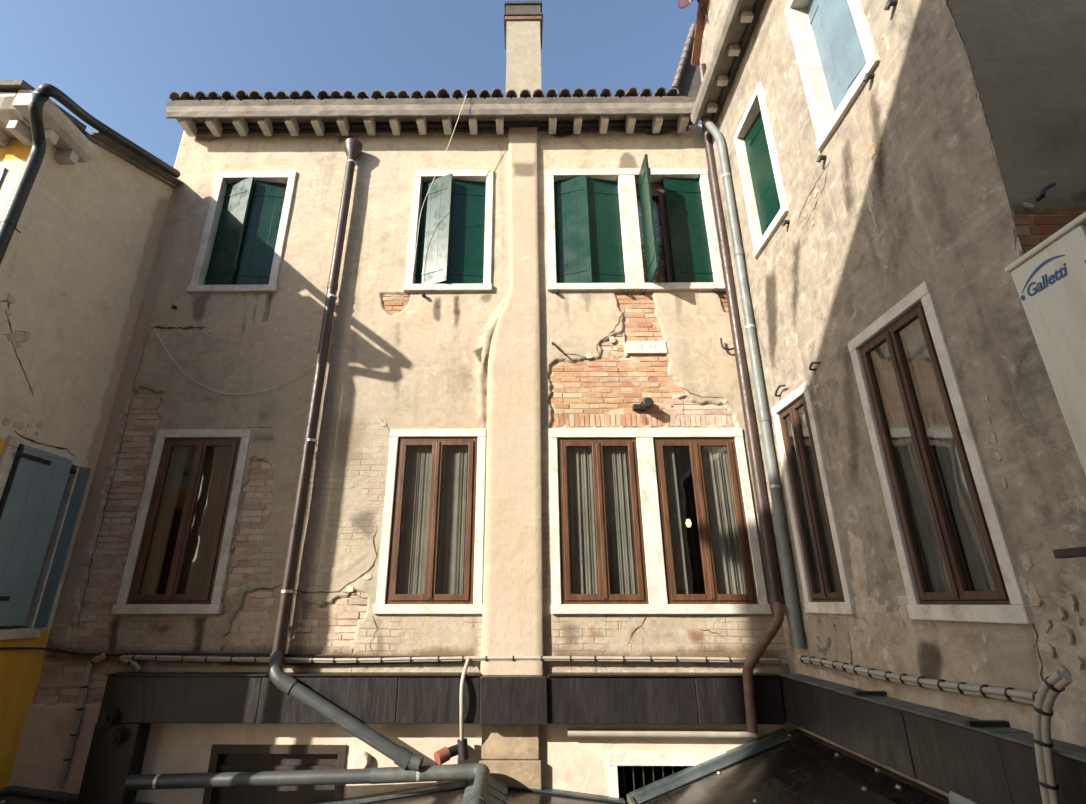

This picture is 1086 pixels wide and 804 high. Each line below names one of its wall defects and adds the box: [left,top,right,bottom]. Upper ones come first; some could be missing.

flaking render [1008,202,1086,258]
crack [1,292,34,396]
flaking render [381,294,410,316]
flaking render [547,291,736,428]
crack [2,418,75,456]
crack [65,326,215,634]
flaking render [33,387,163,704]
flaking render [220,589,274,653]
crack [253,529,379,656]